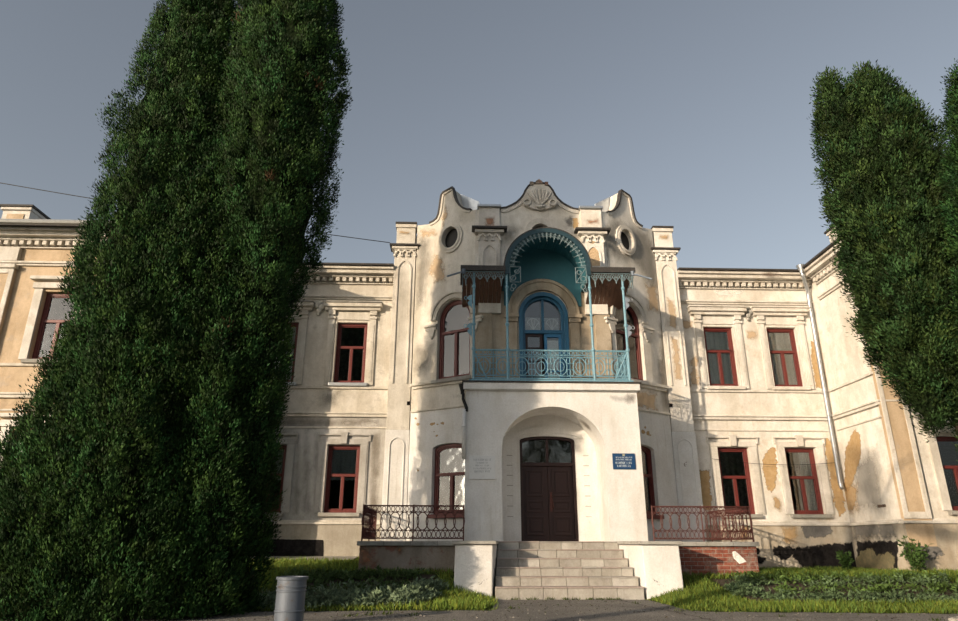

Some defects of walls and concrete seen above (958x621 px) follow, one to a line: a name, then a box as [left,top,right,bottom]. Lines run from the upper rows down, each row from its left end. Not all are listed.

flaking render [648,287,699,384]
flaking render [637,392,657,410]
flaking render [699,470,712,511]
flaking render [762,447,780,510]
flaking render [825,430,861,517]